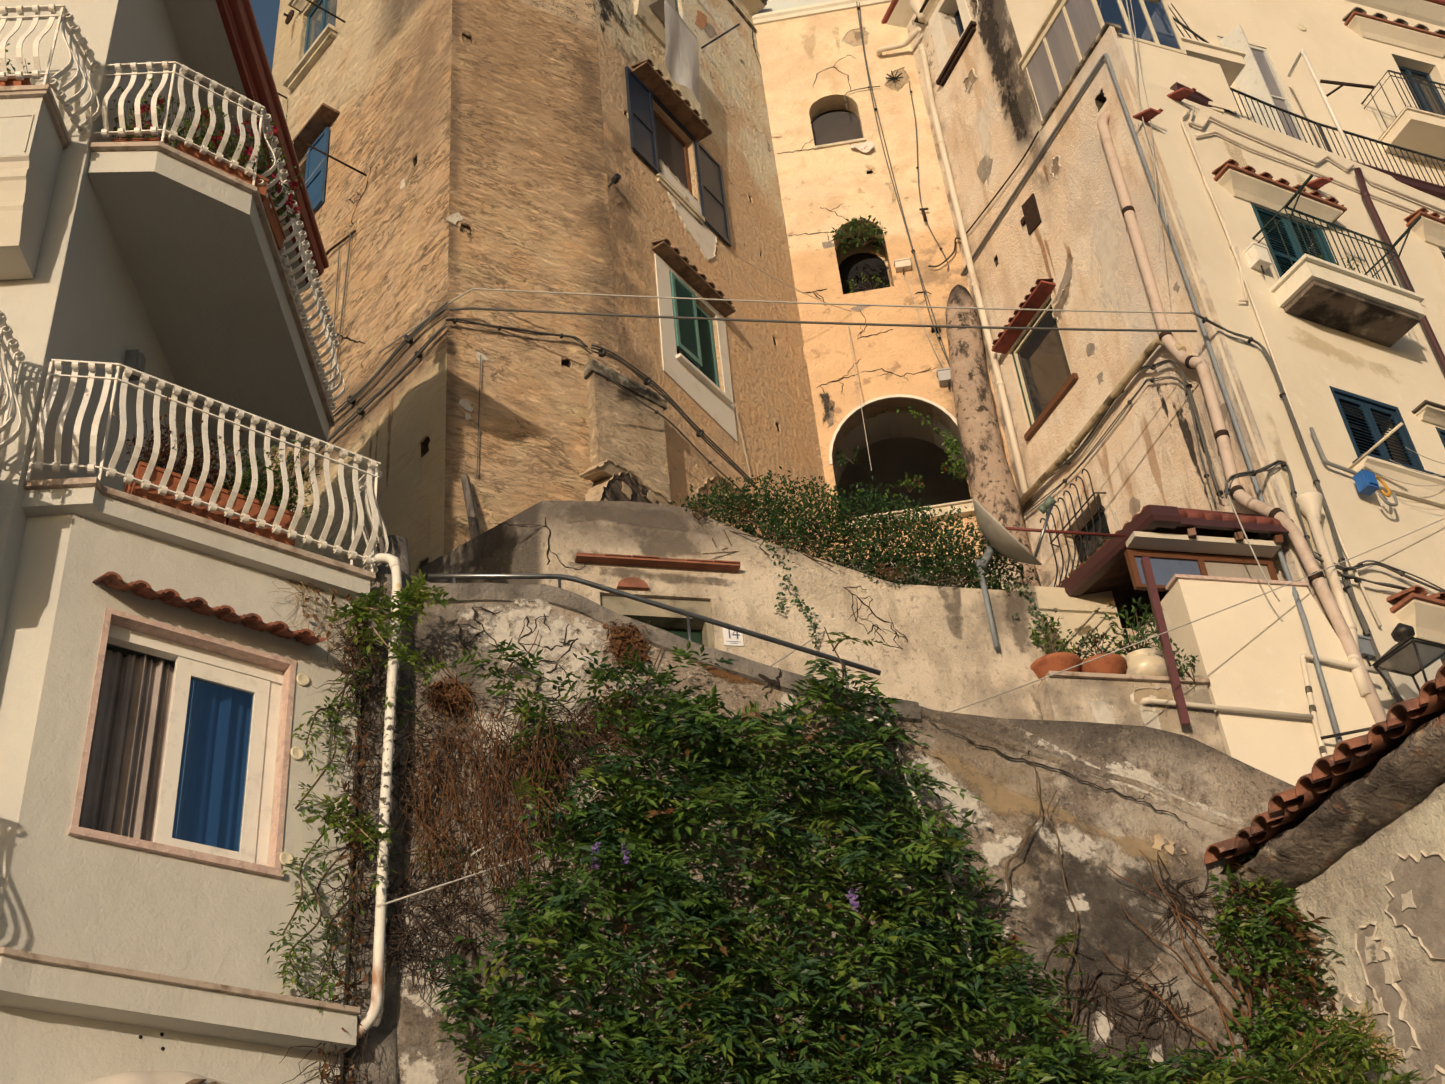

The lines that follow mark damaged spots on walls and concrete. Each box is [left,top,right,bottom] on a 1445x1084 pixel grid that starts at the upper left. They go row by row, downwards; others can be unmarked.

crack [813,55,854,90]
leakage [972,0,1027,155]
crack [788,203,845,240]
crack [816,311,937,402]
crack [929,720,1198,832]
crack [1158,854,1208,920]
peeling [1335,850,1445,1060]